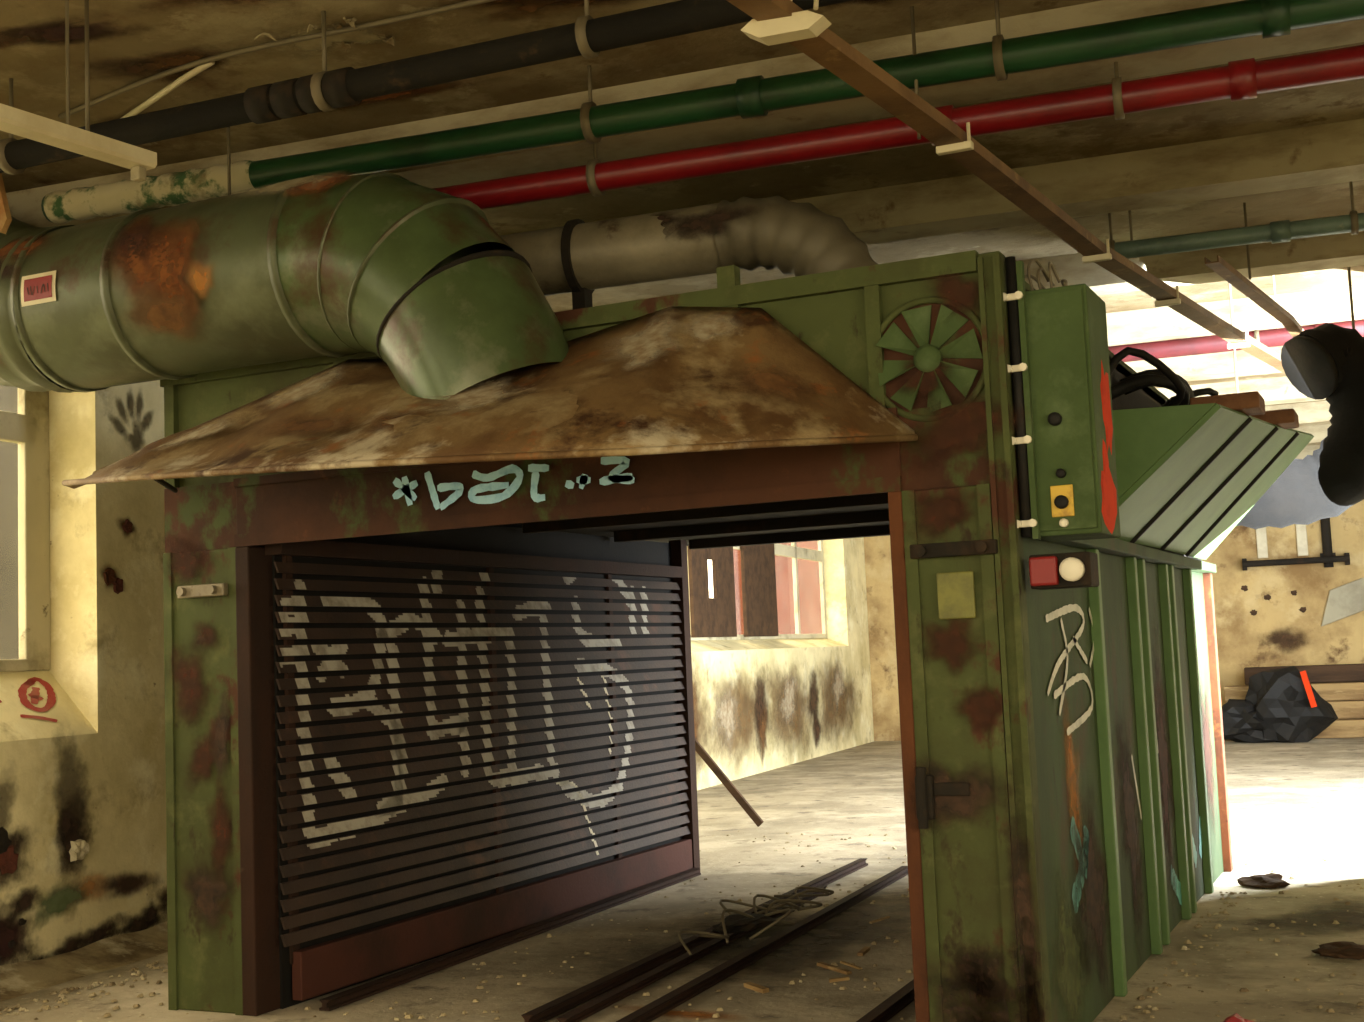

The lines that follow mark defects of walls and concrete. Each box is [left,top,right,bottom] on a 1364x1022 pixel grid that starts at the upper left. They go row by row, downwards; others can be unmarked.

leakage [1269,631,1305,650]
leakage [692,665,854,759]
flaking render [0,783,27,885]
flaking render [57,747,90,874]